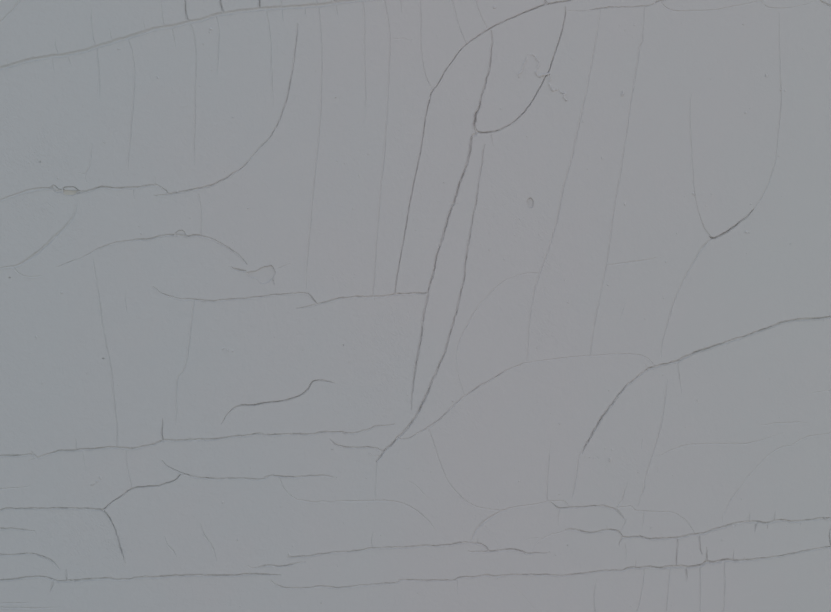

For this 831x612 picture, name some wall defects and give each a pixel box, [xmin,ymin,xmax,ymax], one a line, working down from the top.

crack [55,23,298,273]
crack [0,144,831,612]
crack [152,0,831,426]